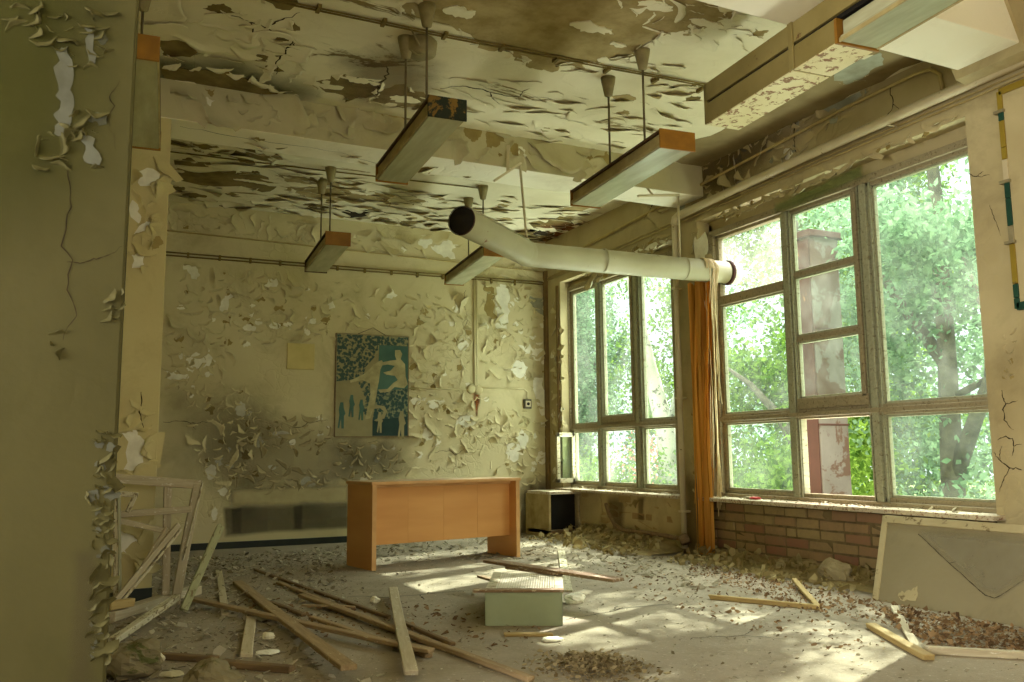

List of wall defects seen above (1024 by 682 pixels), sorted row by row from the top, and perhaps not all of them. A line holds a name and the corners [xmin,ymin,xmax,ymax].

peeling [2,2,120,172]
crack [61,171,121,339]
peeling [130,148,398,220]
peeling [151,34,433,139]
peeling [446,127,511,165]
peeling [517,216,582,242]
peeling [386,0,747,75]
peeling [675,49,923,168]
peeling [480,282,515,336]
peeling [504,342,545,462]
crack [994,394,1021,488]
peeling [85,417,165,665]